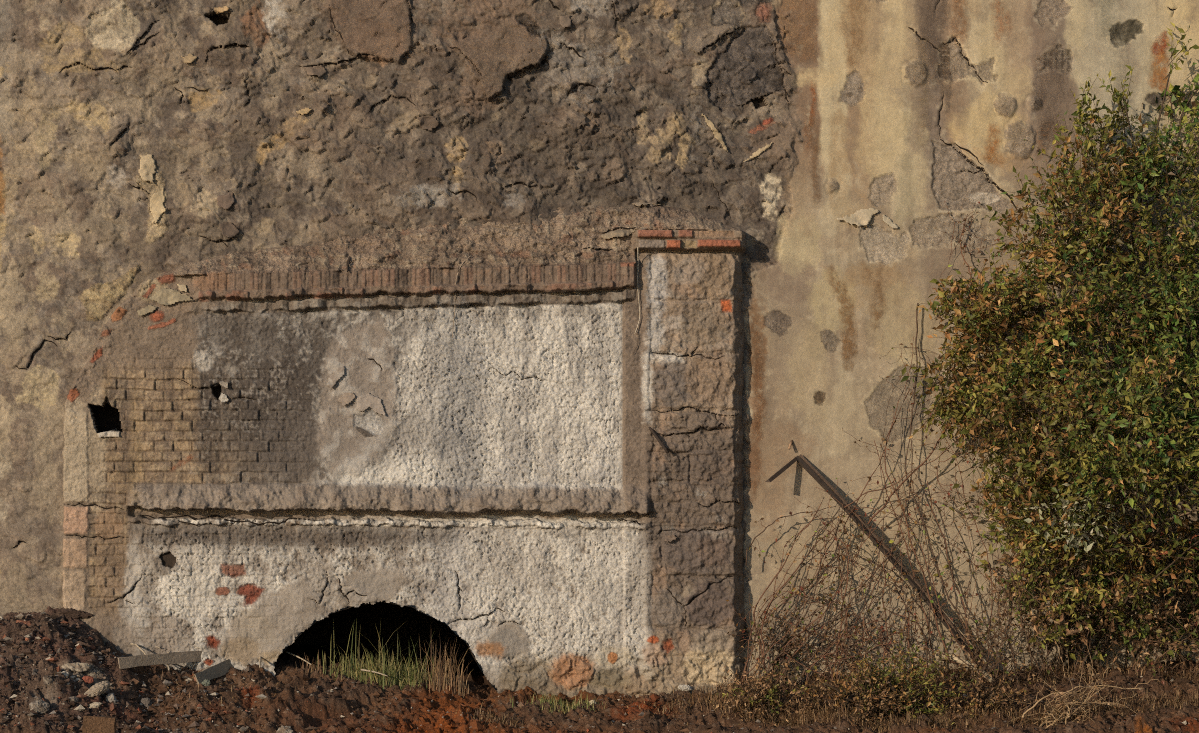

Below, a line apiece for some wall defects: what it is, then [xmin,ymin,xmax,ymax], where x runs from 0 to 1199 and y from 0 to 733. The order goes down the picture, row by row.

flaking render [1110,20,1143,47]
spalling [839,71,864,105]
crack [938,93,1018,210]
peeling [137,153,167,243]
spalling [837,141,1010,263]
spalling [91,274,187,363]
water stain [832,280,855,359]
peeling [219,381,229,402]
spalling [327,366,385,437]
spalling [864,364,933,442]
spalling [215,564,262,604]
crack [311,571,367,604]